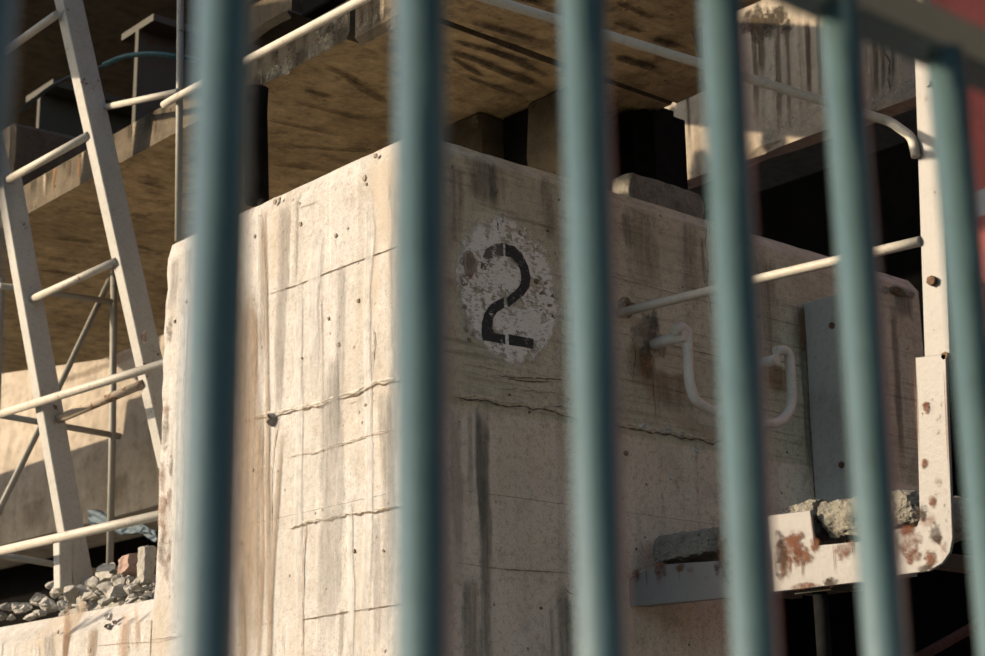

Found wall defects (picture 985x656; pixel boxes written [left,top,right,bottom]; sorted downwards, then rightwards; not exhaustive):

damp [752,19,822,105]
spalling [459,250,476,286]
crack [454,364,571,418]
crack [622,340,721,446]
crack [255,321,394,656]
damp [452,420,490,653]
rust [775,530,836,589]
rust [901,498,942,571]
rust [63,600,85,656]